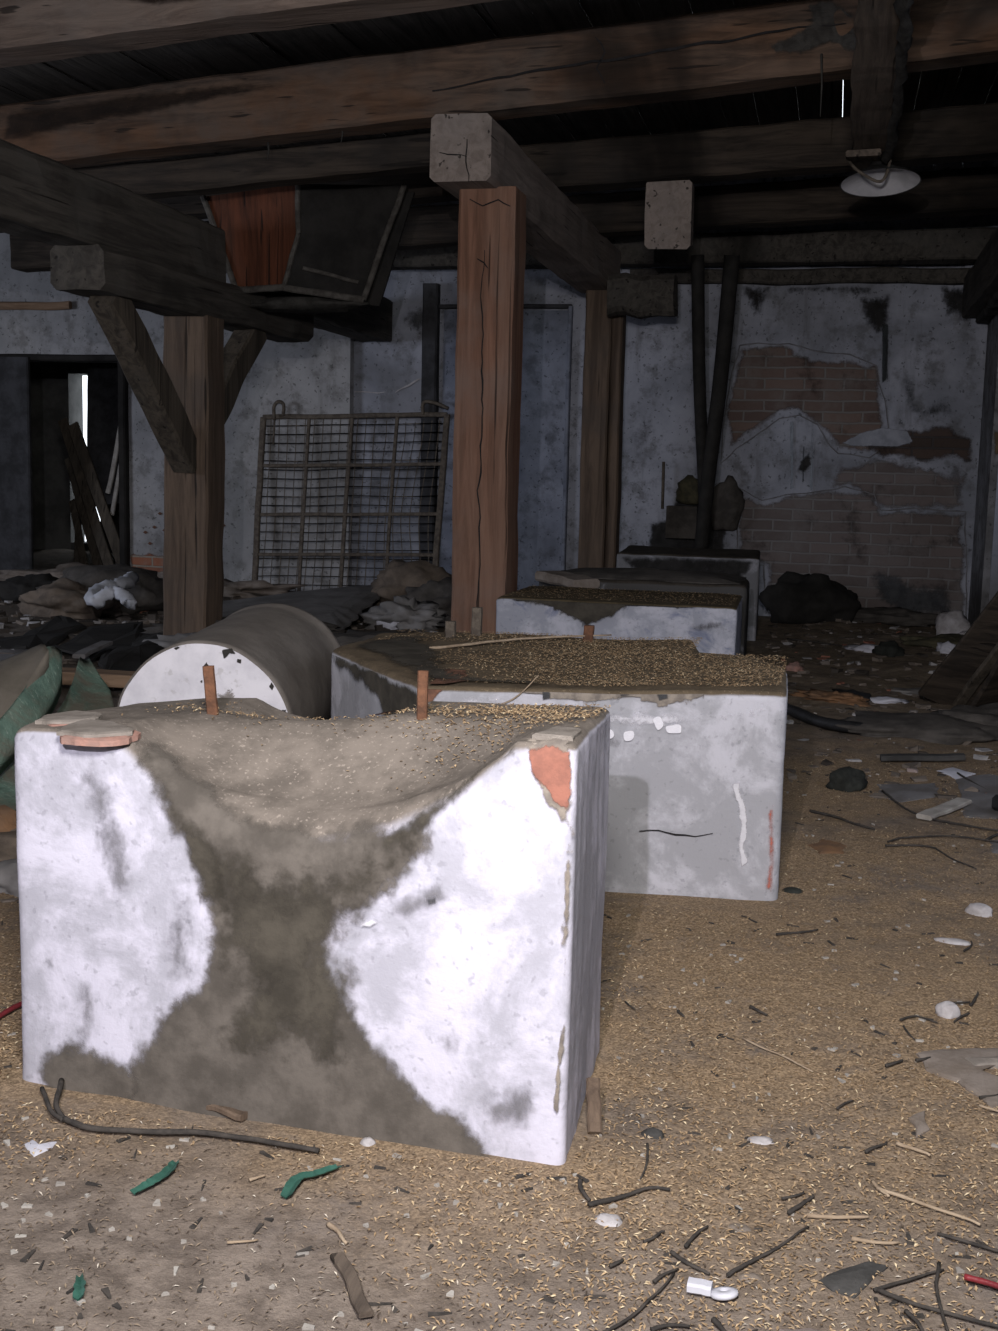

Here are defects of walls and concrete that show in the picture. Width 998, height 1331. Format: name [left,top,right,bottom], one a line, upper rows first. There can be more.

crack [476,250,488,607]
flaking render [650,343,971,617]
spalling [35,710,141,747]
spalling [528,726,581,821]
water stain [40,742,487,1157]
water stain [492,1094,529,1119]